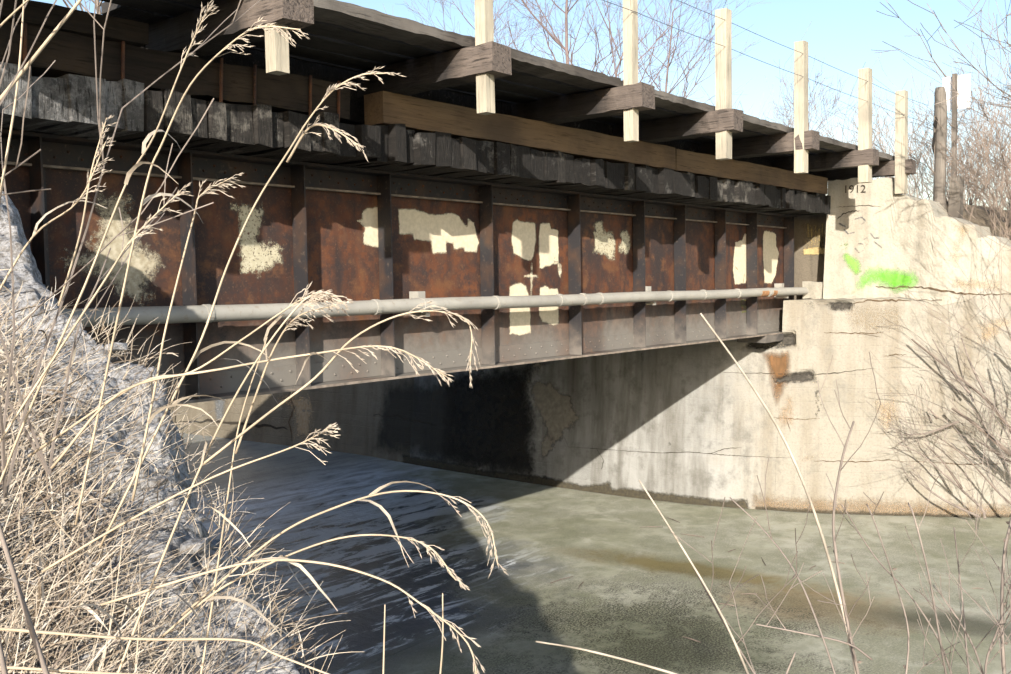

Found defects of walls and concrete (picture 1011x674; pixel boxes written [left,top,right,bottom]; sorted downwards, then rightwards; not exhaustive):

crack [853,286,1005,304]
corrosion [767,354,788,398]
crack [175,393,295,441]
damp [403,369,1011,518]